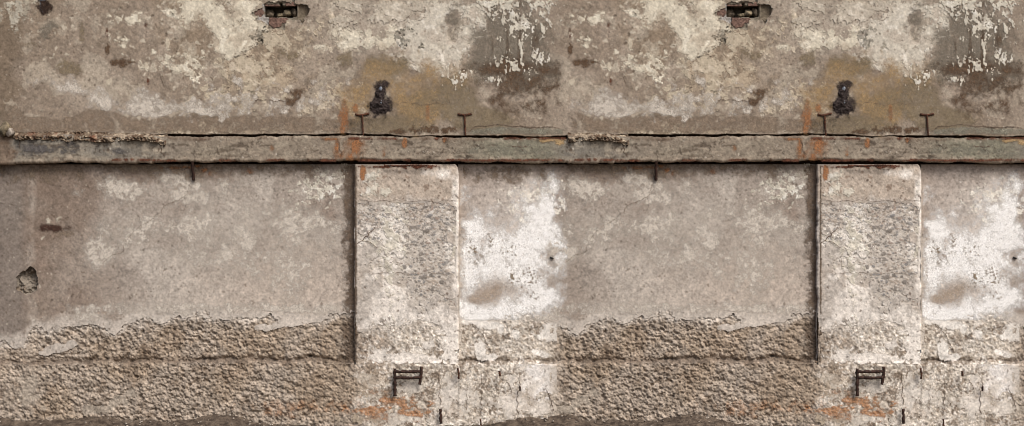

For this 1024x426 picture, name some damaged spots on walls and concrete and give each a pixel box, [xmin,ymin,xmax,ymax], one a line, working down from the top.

peeling [106,11,142,55]
peeling [139,0,605,119]
rust [321,102,673,180]
water stain [0,1,1024,184]
peeling [602,0,1024,119]
rust [783,103,1024,181]
spalling [0,163,1024,426]
rust [342,391,433,422]